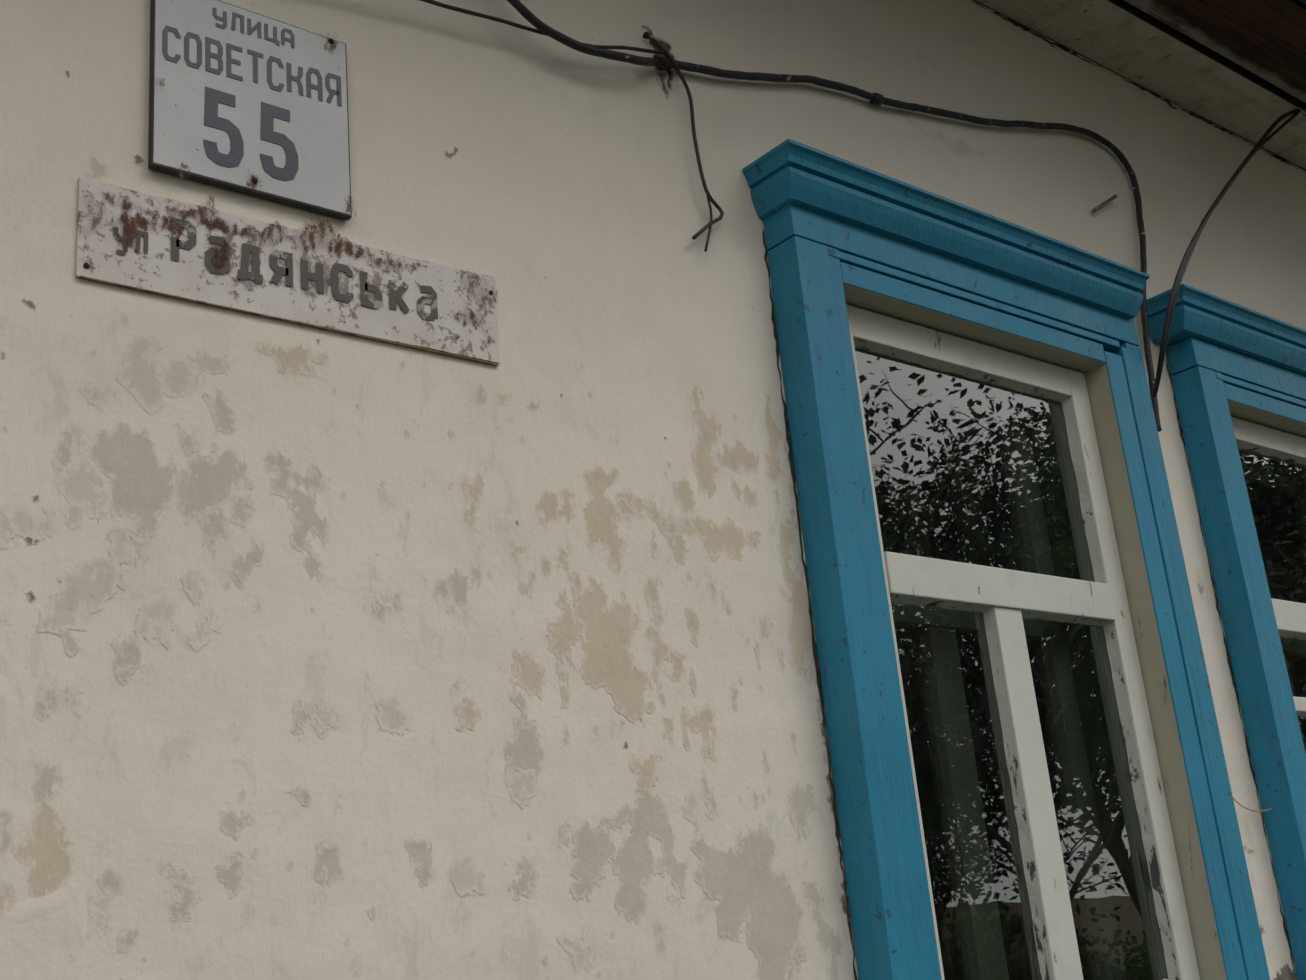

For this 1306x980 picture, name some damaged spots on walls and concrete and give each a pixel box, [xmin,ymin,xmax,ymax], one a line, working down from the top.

peeling [0,757,77,917]
peeling [504,383,854,980]